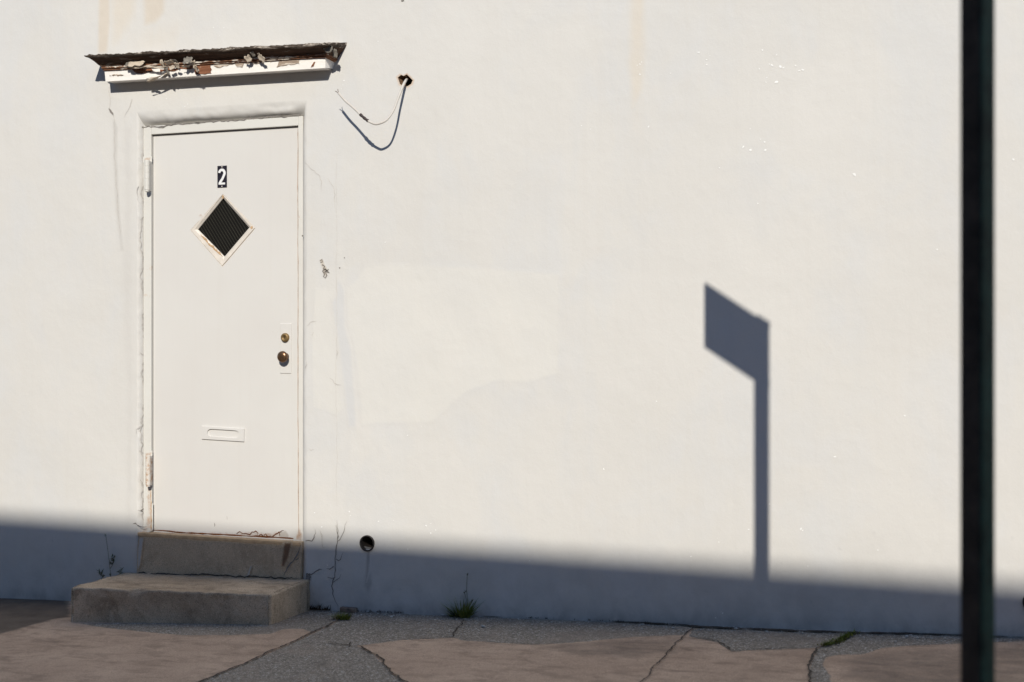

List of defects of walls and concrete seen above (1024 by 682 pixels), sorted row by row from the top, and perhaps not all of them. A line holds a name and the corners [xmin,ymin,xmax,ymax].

peeling [109,57,212,82]
peeling [244,51,315,67]